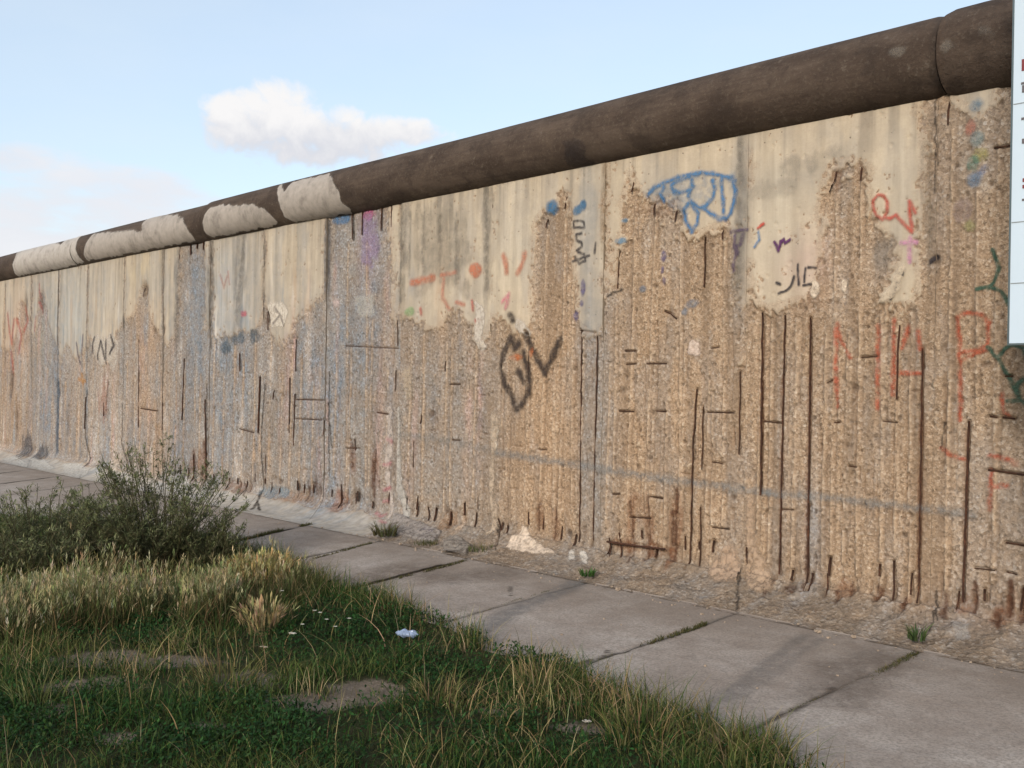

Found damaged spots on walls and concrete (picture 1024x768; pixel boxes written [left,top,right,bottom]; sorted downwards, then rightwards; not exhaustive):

spalling [0,87,1024,673]